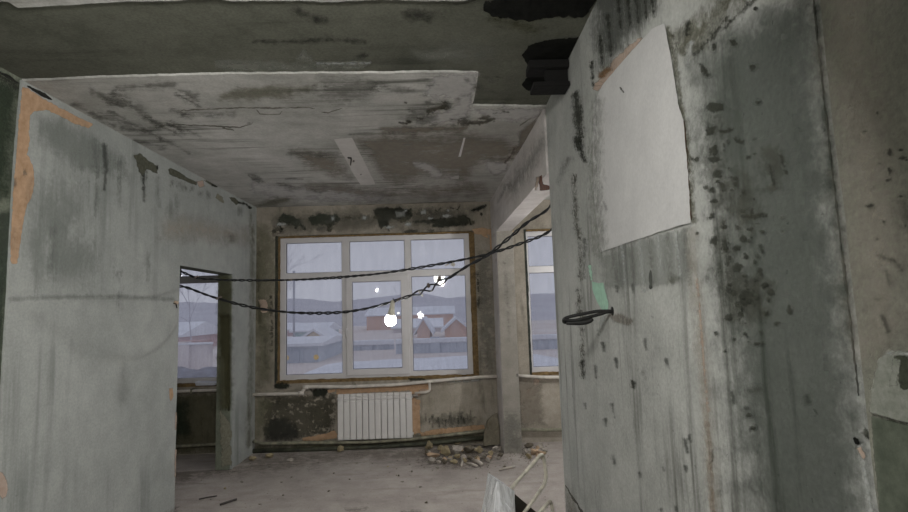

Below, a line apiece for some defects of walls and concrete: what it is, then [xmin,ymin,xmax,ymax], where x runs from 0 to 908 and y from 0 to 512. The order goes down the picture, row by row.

spalling [483,0,596,28]
flaking render [10,87,93,264]
spalling [134,153,252,209]
leakage [672,0,856,512]
peeling [870,350,908,422]